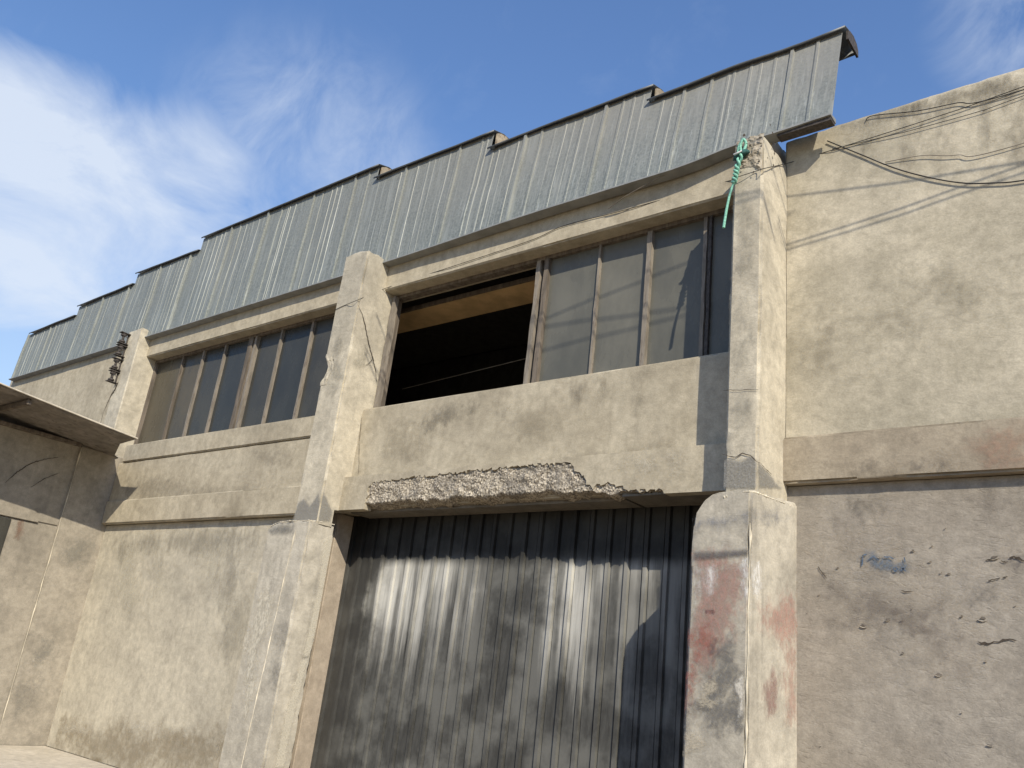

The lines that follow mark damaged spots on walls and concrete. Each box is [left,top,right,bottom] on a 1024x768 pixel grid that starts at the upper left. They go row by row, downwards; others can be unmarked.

spalling [734,124,775,173]
crack [359,308,377,381]
crack [5,457,58,486]
spalling [366,462,663,511]